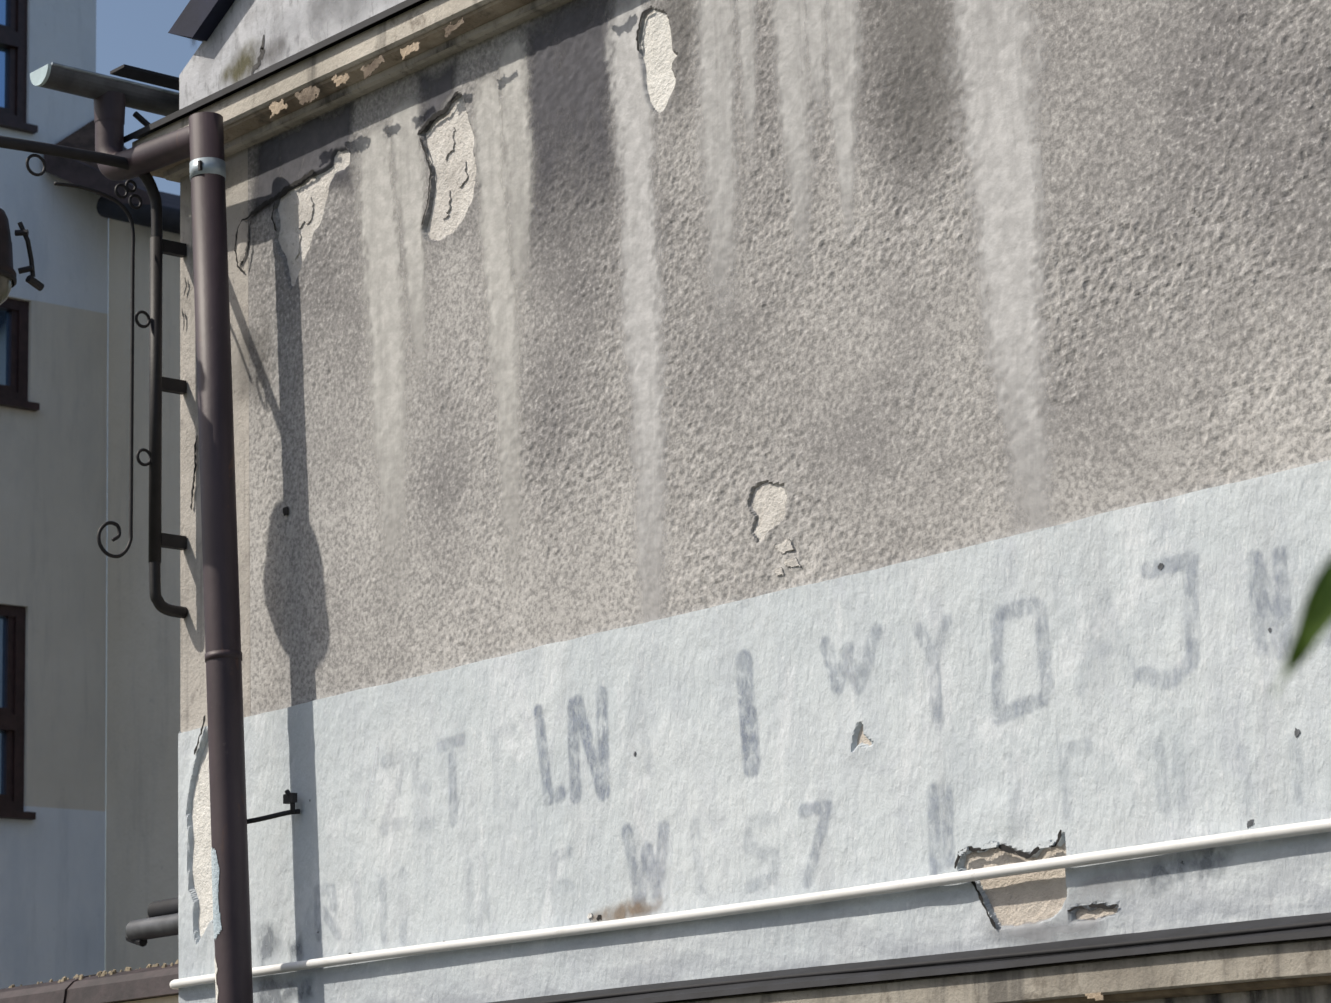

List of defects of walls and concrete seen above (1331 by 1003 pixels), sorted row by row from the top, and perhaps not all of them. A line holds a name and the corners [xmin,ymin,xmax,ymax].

flaking render [249,150,350,287]
water stain [356,99,428,529]
flaking render [417,91,476,241]
water stain [472,41,532,509]
water stain [606,0,665,593]
flaking render [636,7,677,112]
water stain [697,0,757,268]
water stain [772,0,860,222]
water stain [954,0,1048,515]
flaking render [751,482,801,576]
water stain [261,929,273,959]
peeling [954,830,1118,929]